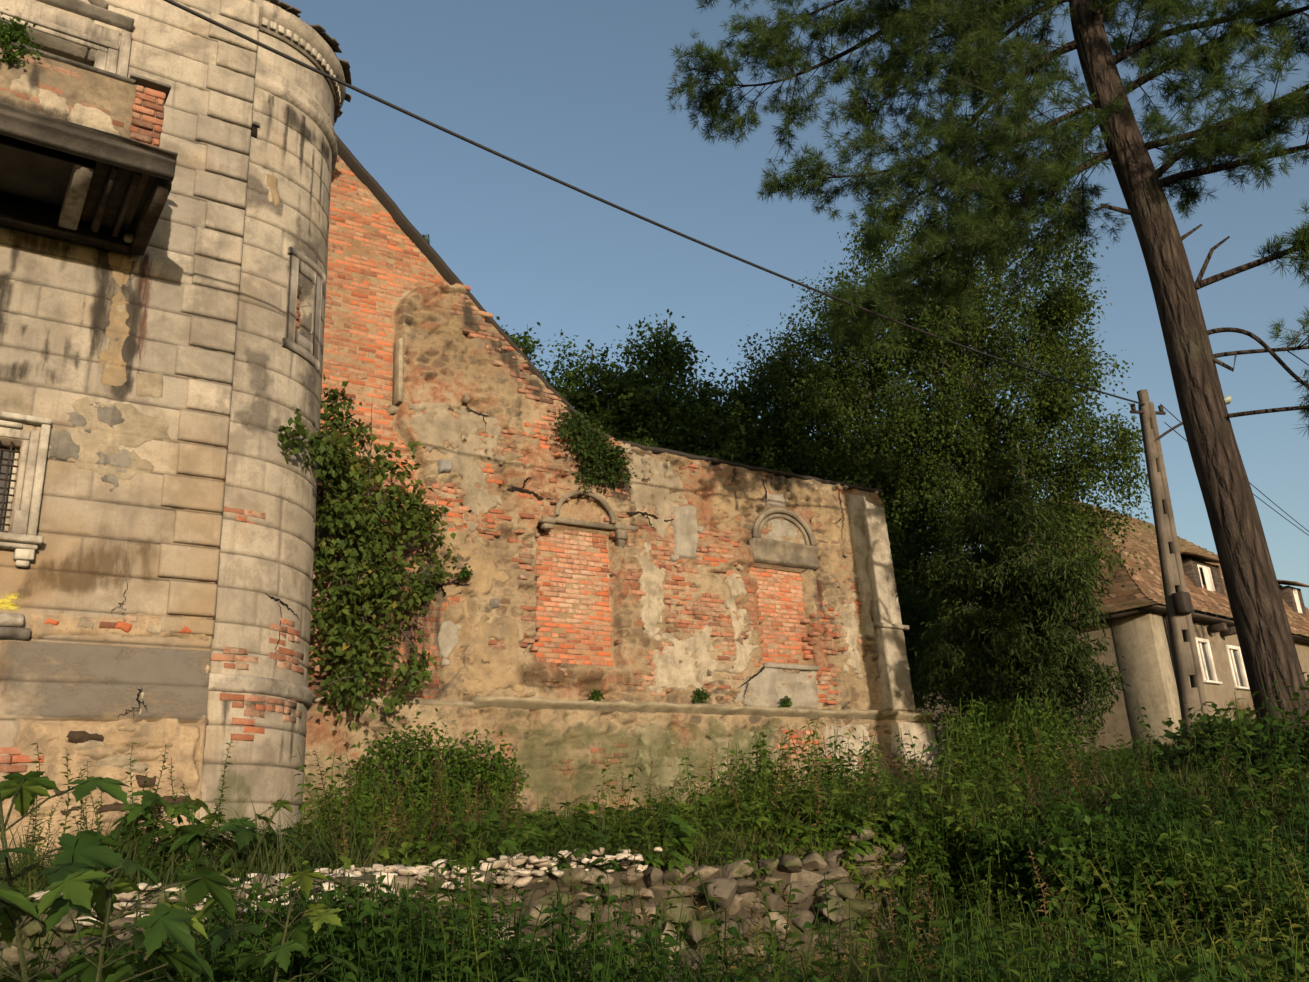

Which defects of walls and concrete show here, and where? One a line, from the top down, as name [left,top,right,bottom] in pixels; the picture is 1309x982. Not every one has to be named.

water stain [248,176,283,215]
water stain [284,107,329,196]
water stain [0,229,71,331]
peeling [49,251,171,492]
water stain [91,249,141,399]
water stain [288,219,317,295]
flaking render [524,415,577,458]
peeling [386,338,540,698]
peeling [621,443,875,705]
crack [265,593,300,668]
crack [117,688,147,720]
spalling [0,618,304,870]